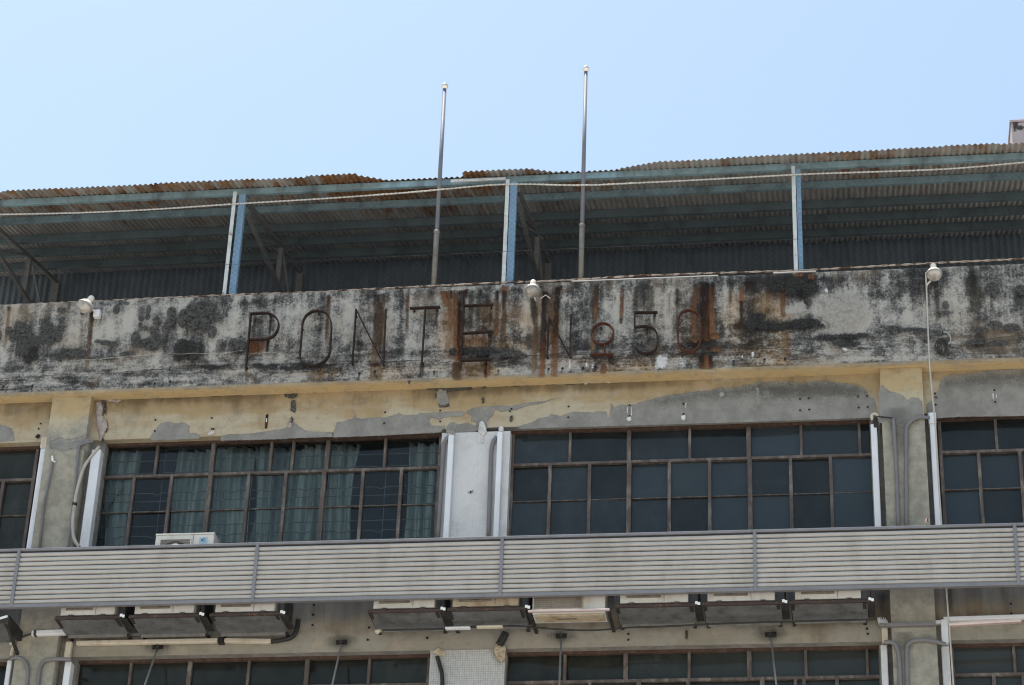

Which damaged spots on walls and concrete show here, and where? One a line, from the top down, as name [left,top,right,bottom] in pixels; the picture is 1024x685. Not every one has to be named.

damp [766,276,820,301]
damp [930,281,954,317]
damp [970,269,998,306]
damp [0,302,232,369]
corrosion [435,286,508,380]
corrosion [530,285,562,377]
corrosion [691,282,721,369]
damp [745,309,870,347]
damp [886,325,932,333]
damp [965,320,1021,346]
peeling [220,369,1024,441]
peeling [151,422,200,441]